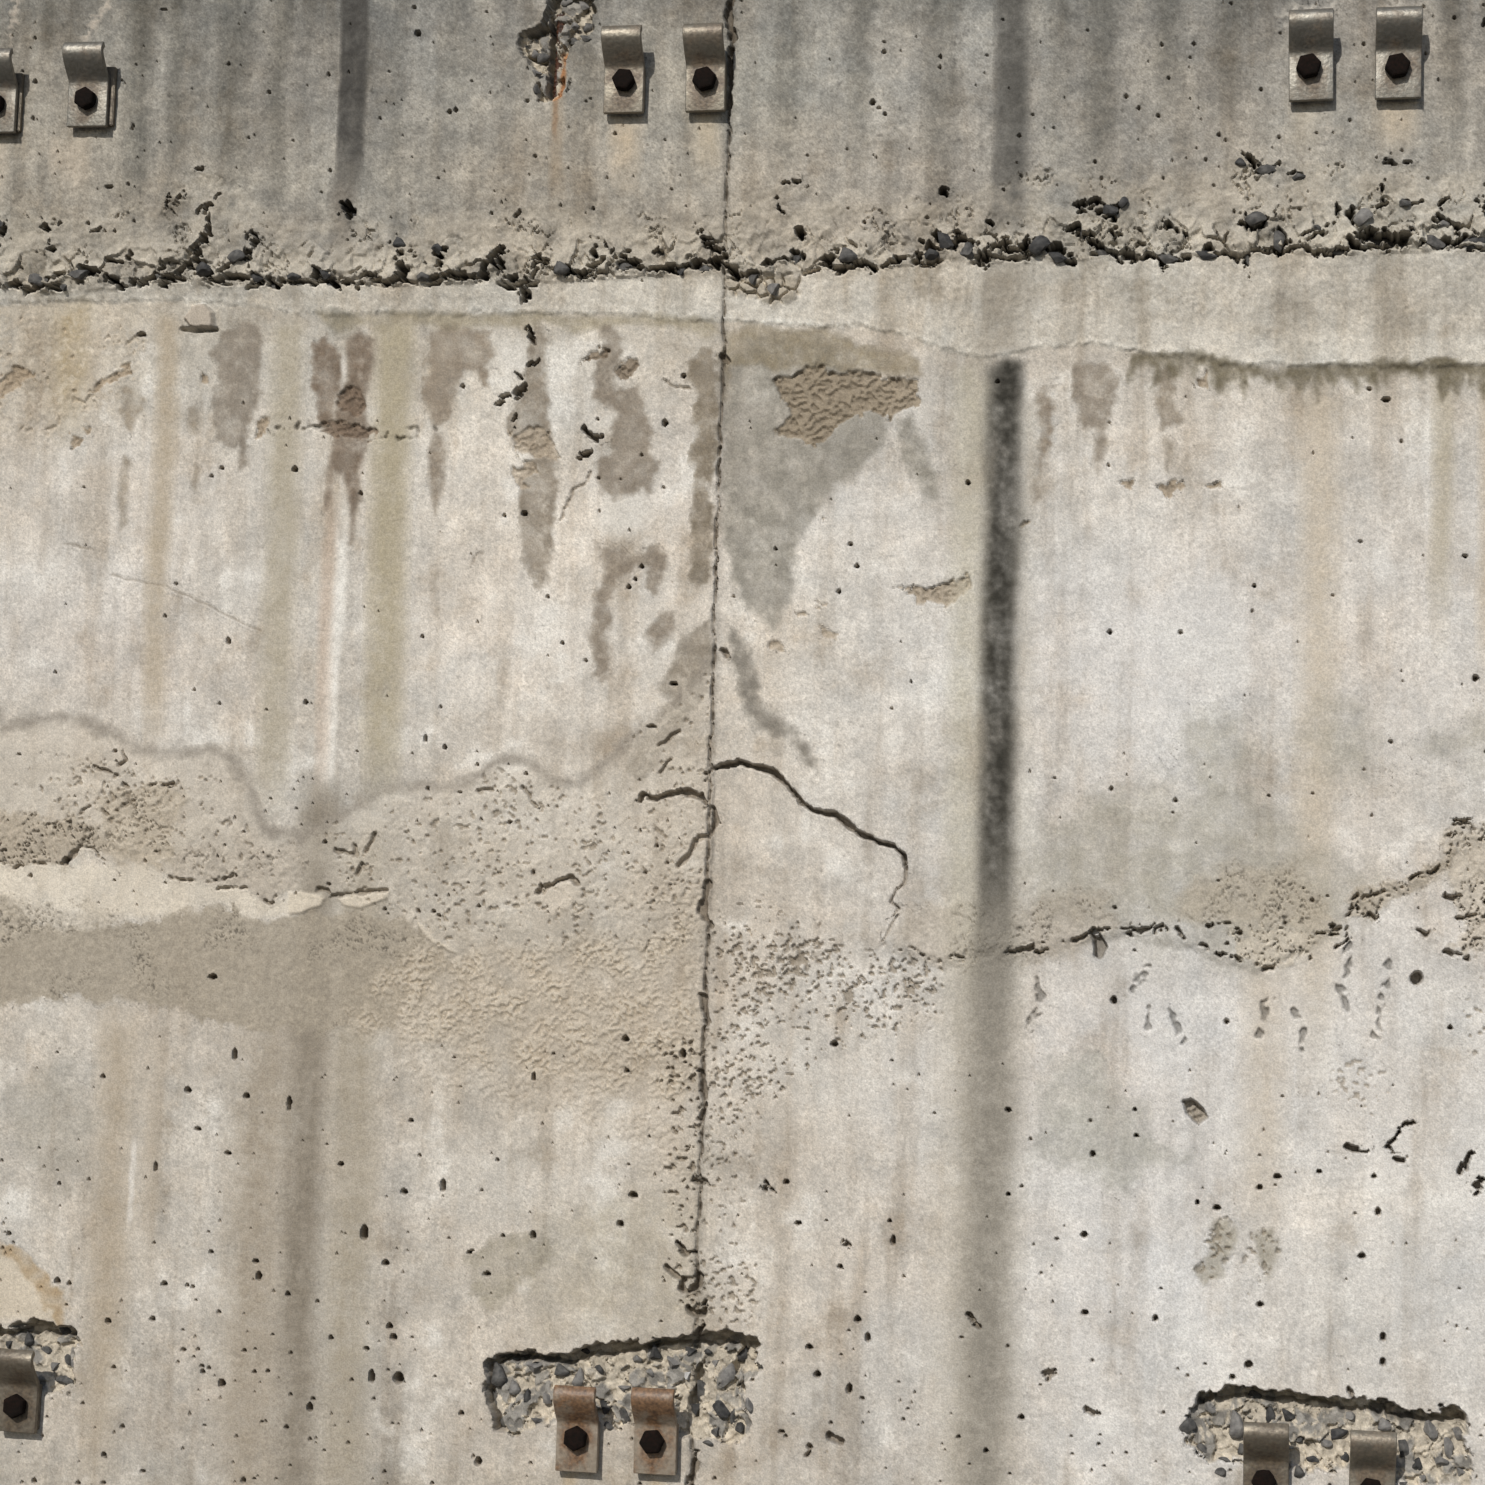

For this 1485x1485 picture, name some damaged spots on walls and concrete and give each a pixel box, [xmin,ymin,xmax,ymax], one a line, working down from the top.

damp [326,0,371,229]
spalling [0,148,1485,461]
crack [900,244,1485,270]
damp [0,297,822,920]
crack [0,0,971,1335]
damp [202,1020,389,1485]
peeling [0,787,985,1447]
damp [684,265,1485,1485]
crack [1004,817,1485,974]
peeling [1184,818,1485,1168]
crack [683,1437,702,1485]
spalling [1179,1384,1474,1485]